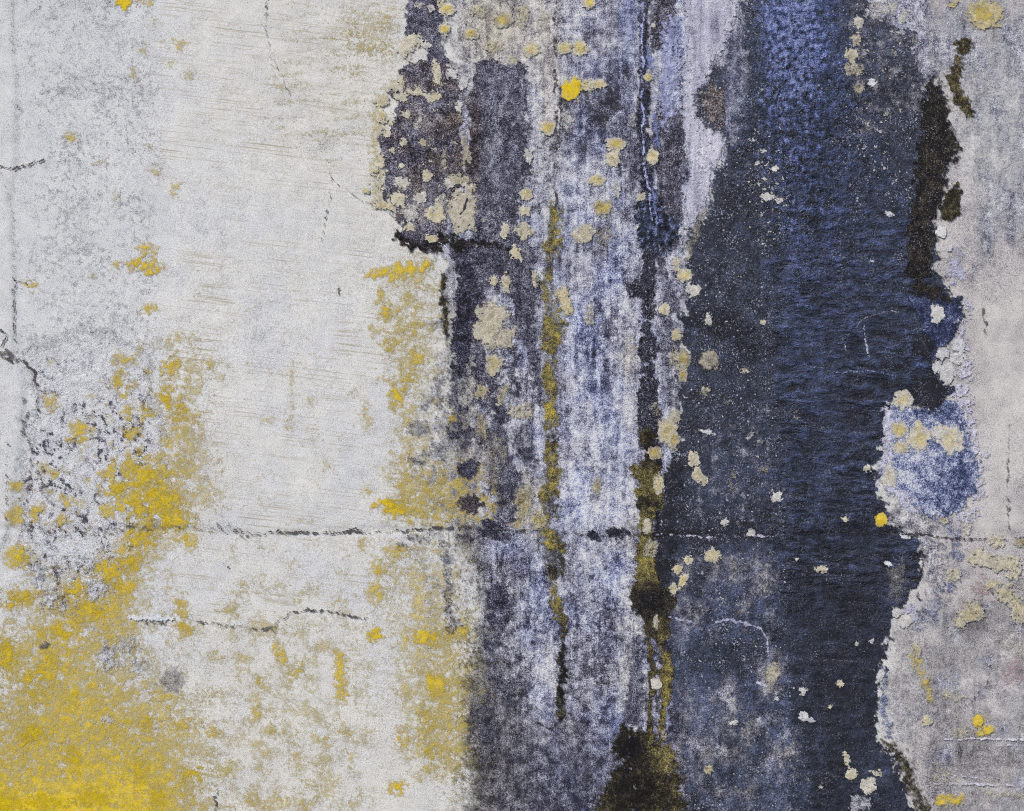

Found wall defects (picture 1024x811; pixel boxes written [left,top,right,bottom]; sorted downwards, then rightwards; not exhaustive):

crack [0,203,1024,585]
damp [324,0,1024,811]
crack [188,607,367,633]